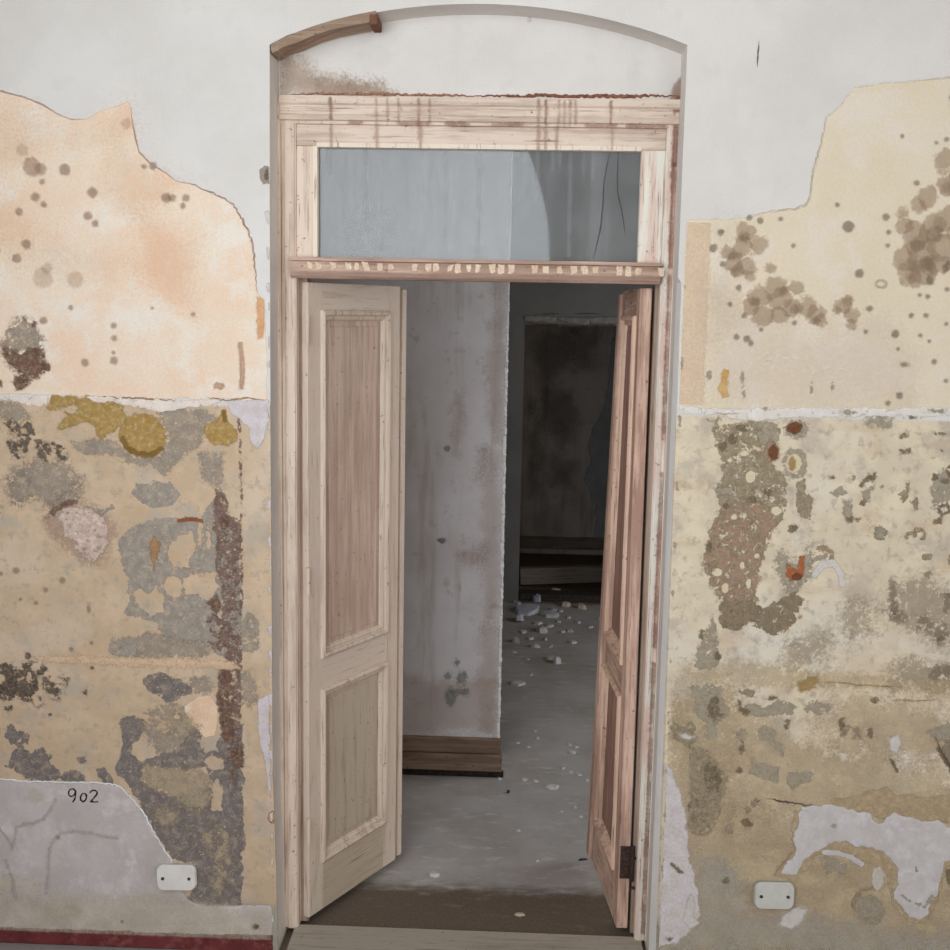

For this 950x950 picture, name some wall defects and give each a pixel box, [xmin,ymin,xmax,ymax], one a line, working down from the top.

damp [0,316,50,390]
peeling [0,90,271,659]
peeling [678,76,950,670]
peeling [4,724,86,782]
peeling [96,672,246,905]
peeling [257,694,273,797]
peeling [668,683,830,790]
peeling [890,734,901,772]